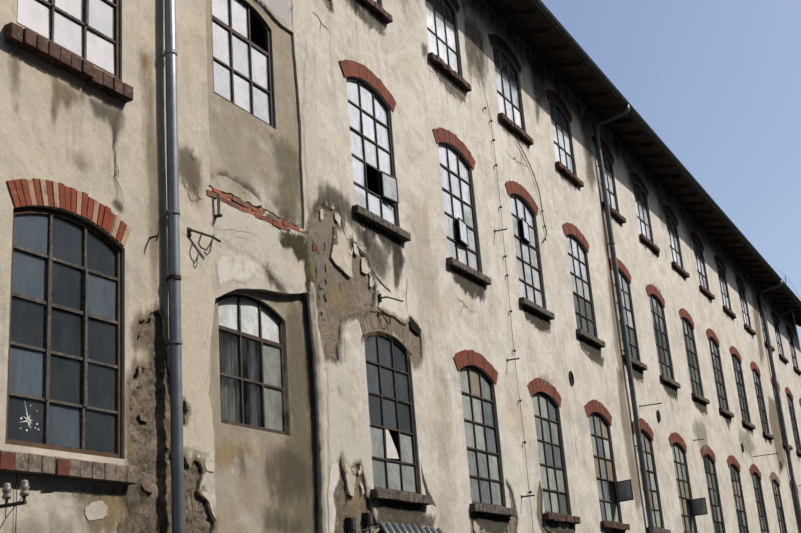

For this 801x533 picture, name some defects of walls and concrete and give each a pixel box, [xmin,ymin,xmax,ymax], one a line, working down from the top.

damp [53,79,123,138]
damp [432,63,466,102]
damp [465,17,488,83]
crack [113,123,124,200]
damp [471,0,795,383]
flaking render [182,173,423,368]
damp [451,267,486,301]
flaking render [83,305,172,533]
flaking render [183,450,219,533]
flaking render [333,452,381,533]
flaking render [471,480,518,533]